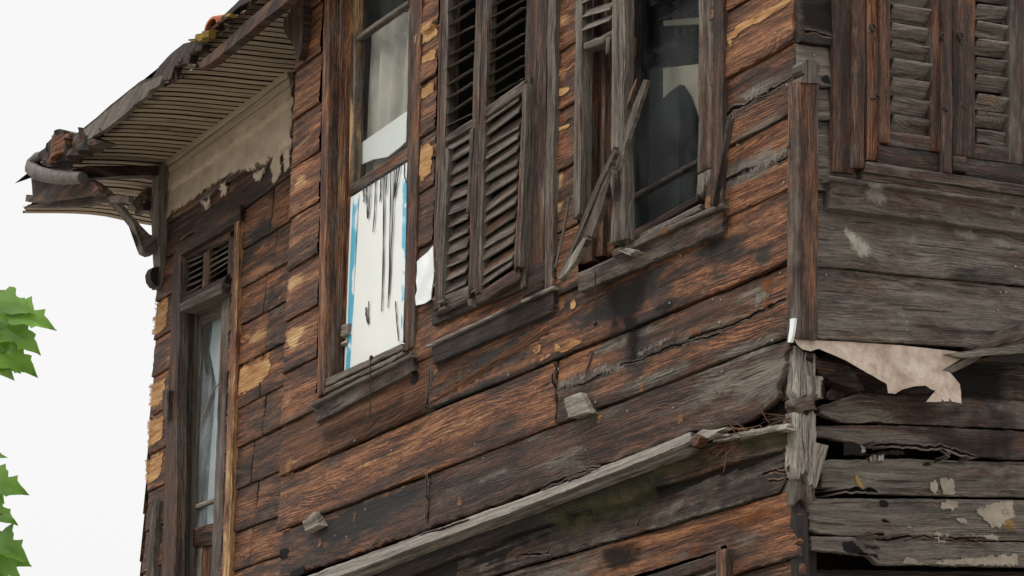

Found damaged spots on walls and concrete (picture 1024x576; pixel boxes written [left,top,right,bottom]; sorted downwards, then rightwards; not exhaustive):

crack [726,75,794,121]
peeling [166,84,294,219]
spalling [238,353,271,396]
crack [551,297,787,398]
peeling [788,318,961,404]
spalling [145,378,166,484]
crack [863,441,975,464]
crack [761,459,986,550]
peeling [900,477,1018,566]